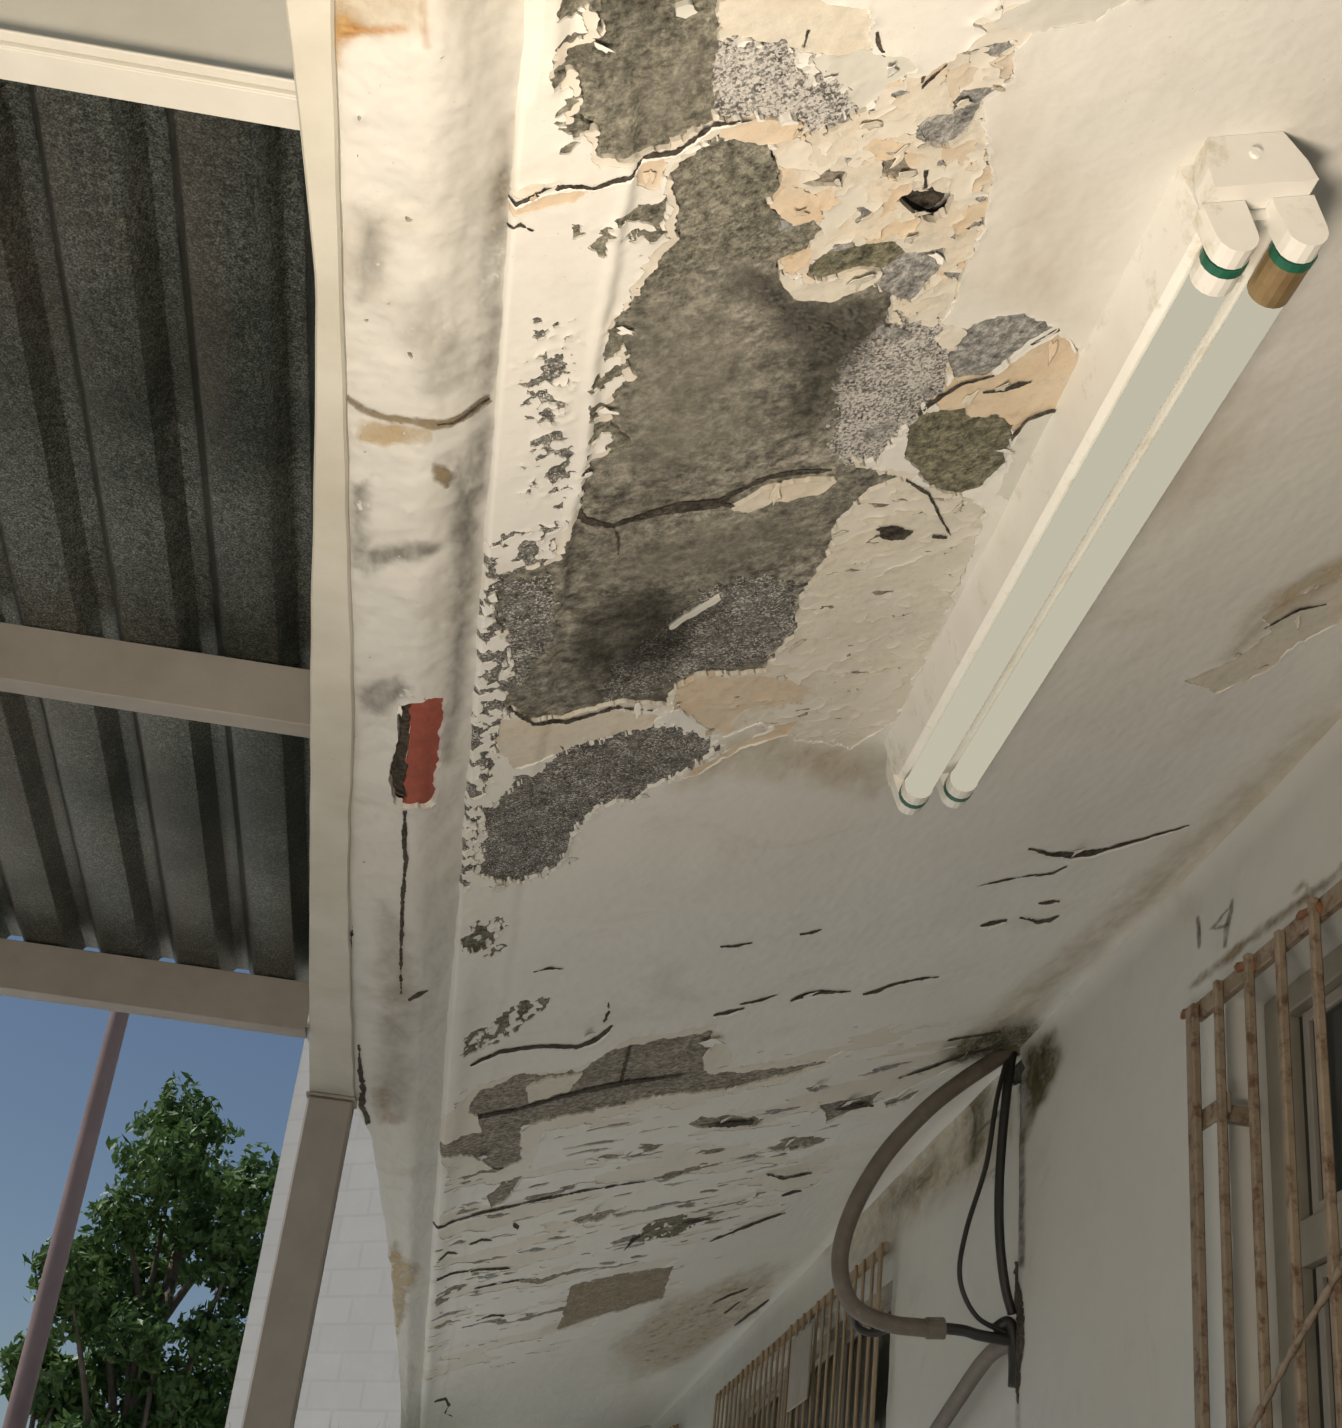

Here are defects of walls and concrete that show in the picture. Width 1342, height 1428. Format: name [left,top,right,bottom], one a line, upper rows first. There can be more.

crack [506,120,752,232]
crack [347,395,491,488]
spalling [459,0,1128,893]
crack [577,469,832,555]
peeling [1187,565,1342,692]
flaking render [391,698,444,809]
crack [399,811,428,1001]
peeling [461,916,508,957]
crack [978,825,1190,930]
leakage [952,1026,1059,1109]
peeling [422,1024,968,1380]